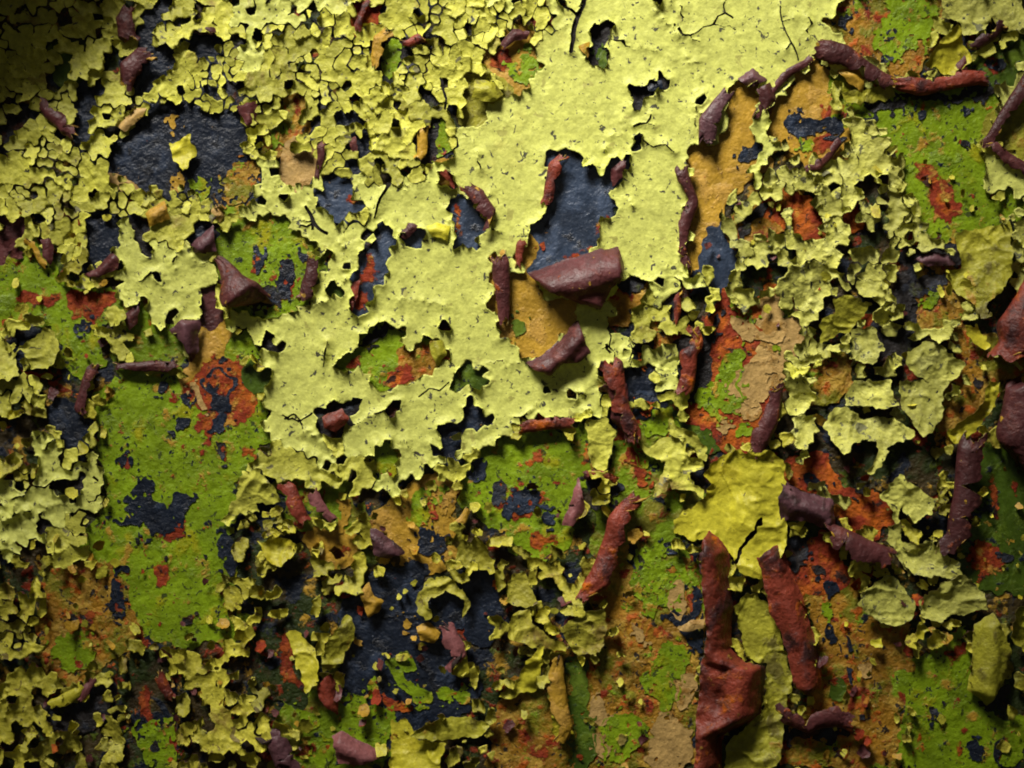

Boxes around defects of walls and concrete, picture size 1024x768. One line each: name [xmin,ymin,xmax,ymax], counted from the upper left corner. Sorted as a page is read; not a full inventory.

crack [561,0,586,53]
crack [374,183,392,219]
crack [300,205,328,235]
peeling [959,272,972,288]
crack [731,517,763,565]
peeling [96,565,108,579]
peeling [428,590,465,629]
peeling [915,624,929,640]
peeling [255,640,277,662]
peeling [1013,671,1024,691]
peeling [375,743,387,757]
peeling [996,739,1011,753]